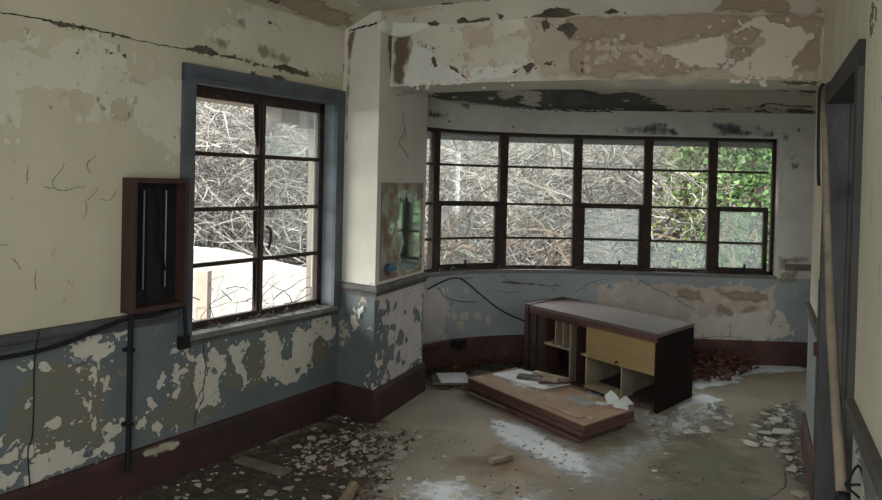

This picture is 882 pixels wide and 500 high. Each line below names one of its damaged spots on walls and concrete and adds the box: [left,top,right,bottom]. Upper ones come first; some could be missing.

peeling [0,18,182,165]
crack [0,12,188,51]
peeling [187,0,344,82]
peeling [403,7,824,113]
peeling [869,0,878,38]
crack [495,275,602,293]
peeling [590,275,799,342]
peeling [0,275,491,491]